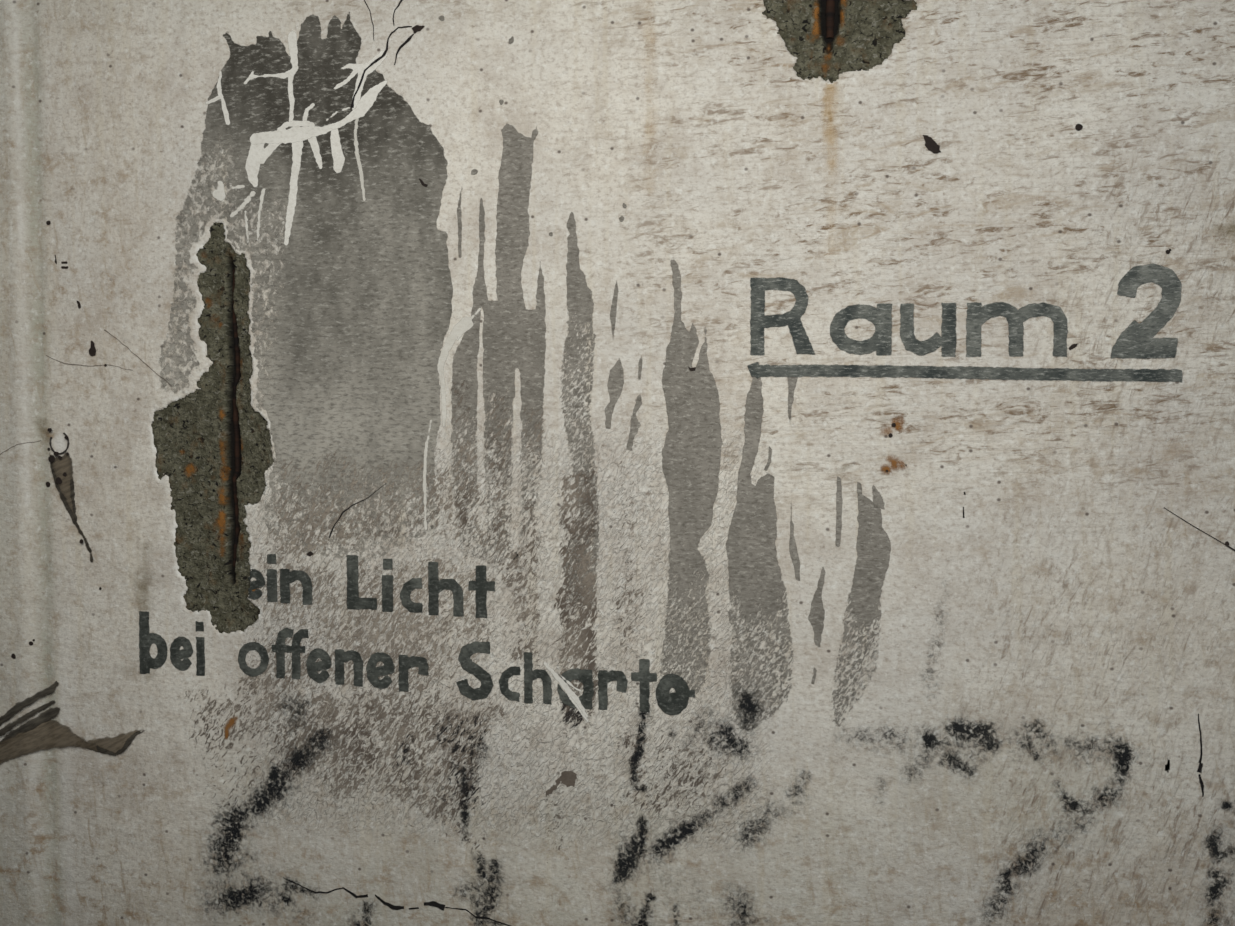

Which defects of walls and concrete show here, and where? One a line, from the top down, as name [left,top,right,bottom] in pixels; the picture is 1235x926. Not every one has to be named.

spalling [762,0,917,83]
rust [884,419,903,438]
rust [881,457,907,473]
spalling [151,222,546,852]
peeling [612,461,646,649]
peeling [554,469,599,738]
flaking render [546,771,577,850]
peeling [612,734,734,818]
crack [283,877,511,926]